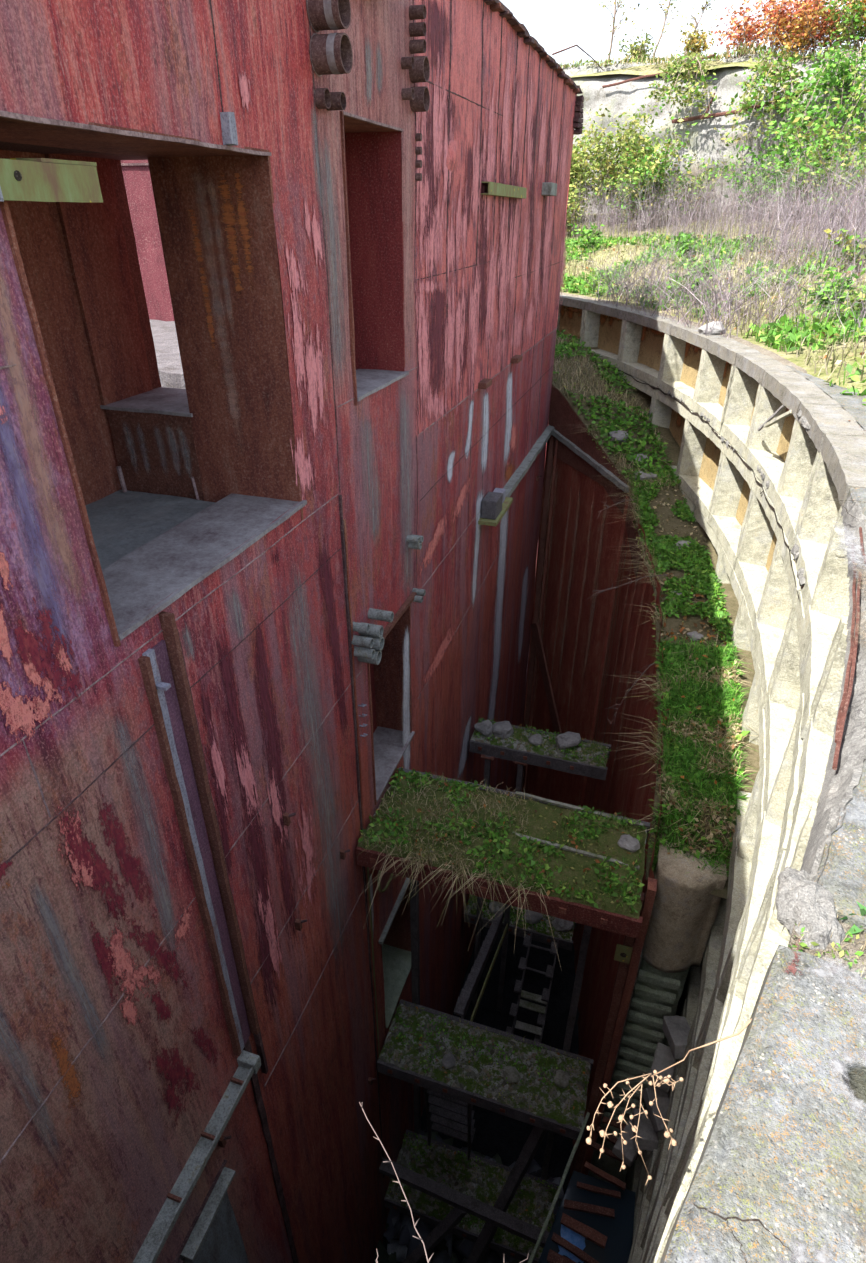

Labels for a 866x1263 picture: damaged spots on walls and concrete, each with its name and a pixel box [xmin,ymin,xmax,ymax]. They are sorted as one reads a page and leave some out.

rust [216,172,253,298]
peeling [0,551,88,749]
spalling [776,490,866,951]
peeling [49,787,223,1126]